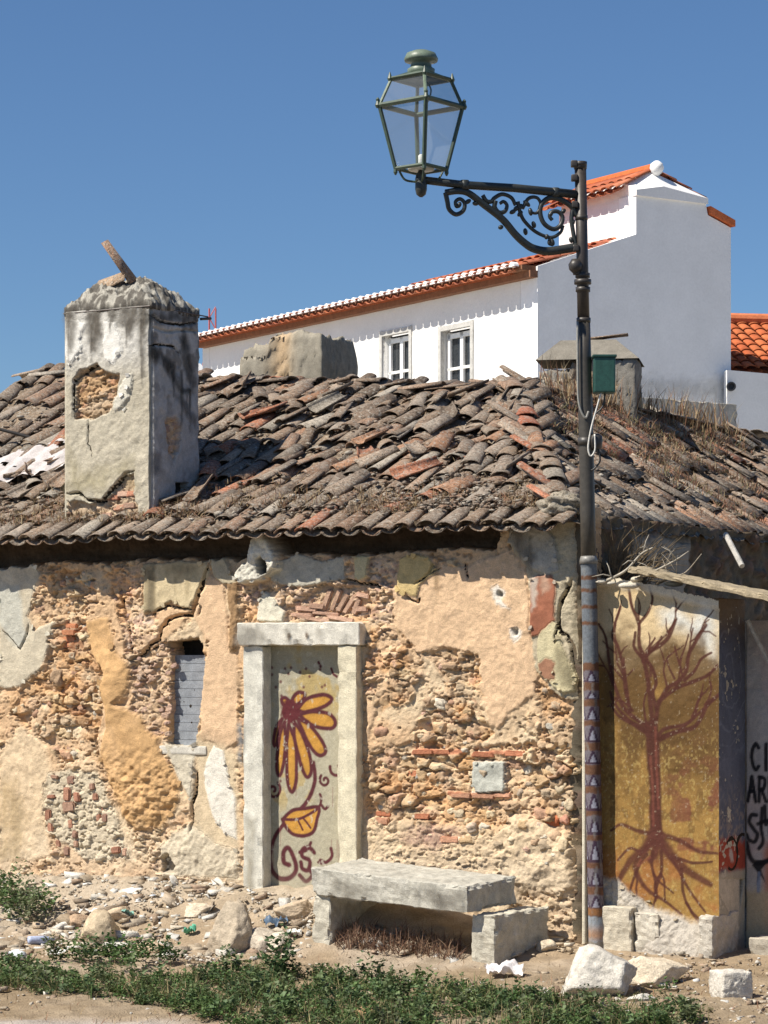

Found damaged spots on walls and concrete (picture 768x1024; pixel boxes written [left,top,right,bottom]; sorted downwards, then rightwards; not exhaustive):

water stain [65,311,74,341]
spalling [65,319,132,420]
water stain [87,307,197,350]
water stain [142,338,195,421]
spalling [66,473,138,521]
spalling [0,535,373,865]
spalling [365,553,582,866]